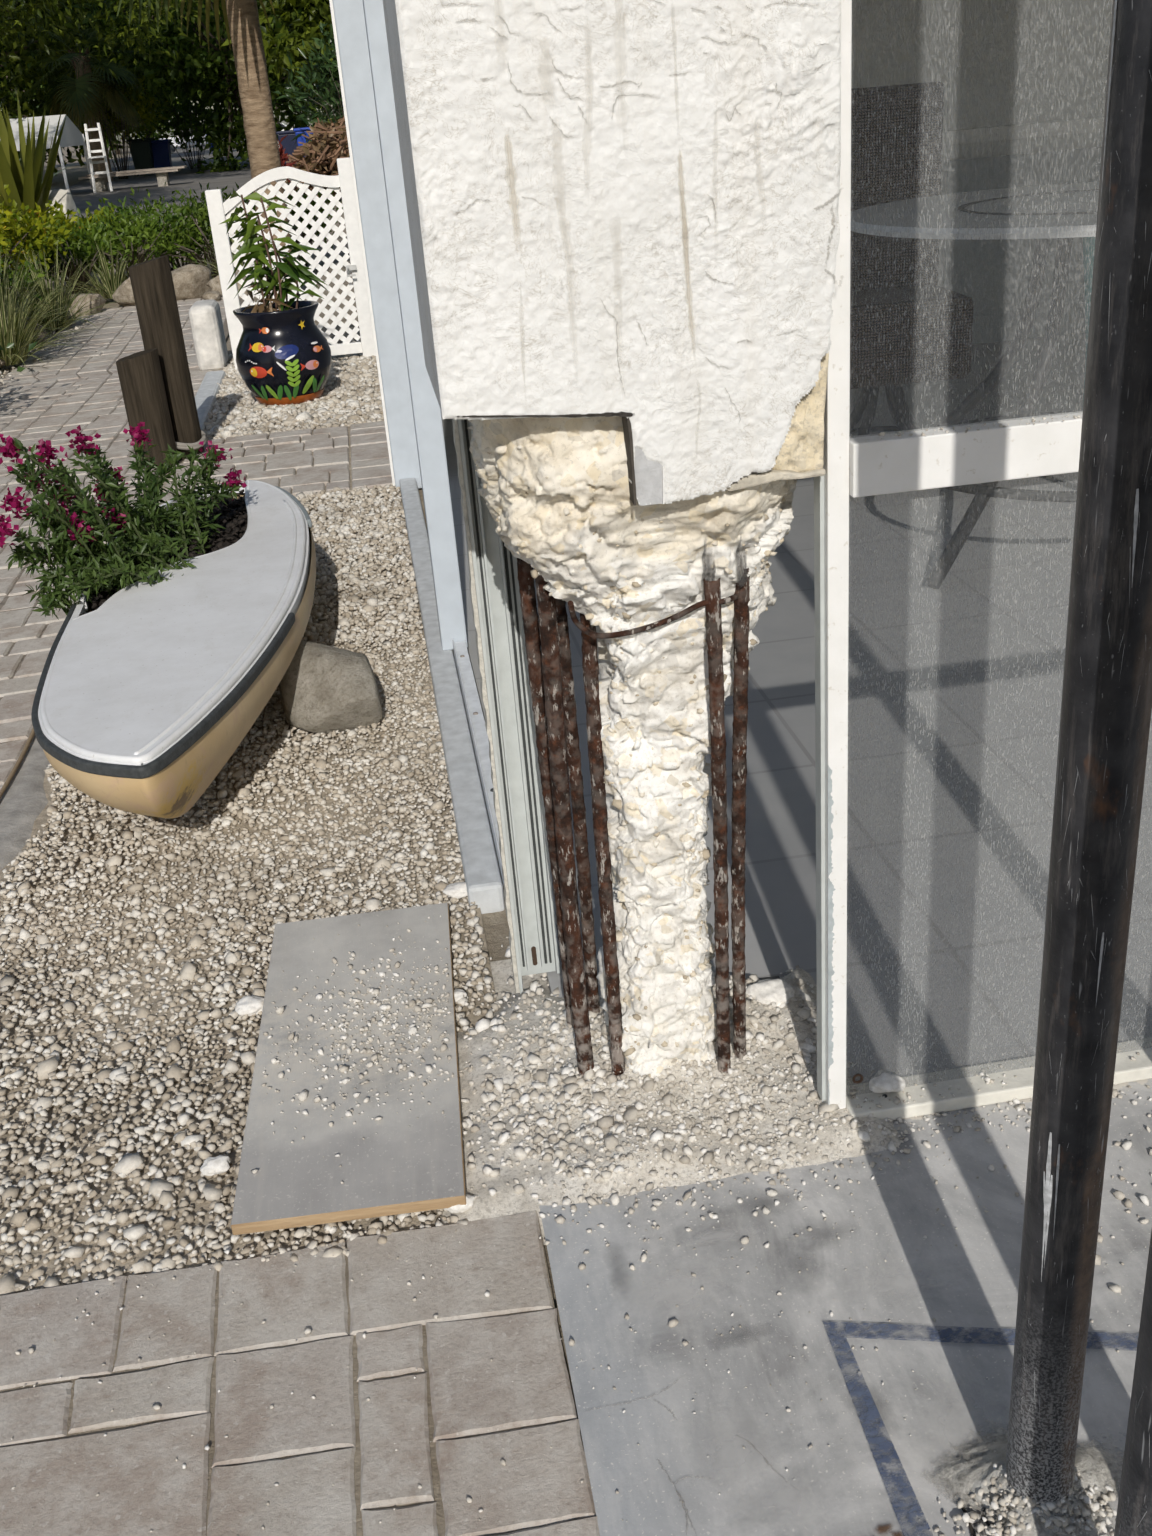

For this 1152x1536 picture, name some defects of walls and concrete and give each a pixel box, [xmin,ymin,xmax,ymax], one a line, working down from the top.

crack [457,412,637,506]
rust [702,546,716,581]
rust [736,538,747,587]
spalling [468,352,829,1078]